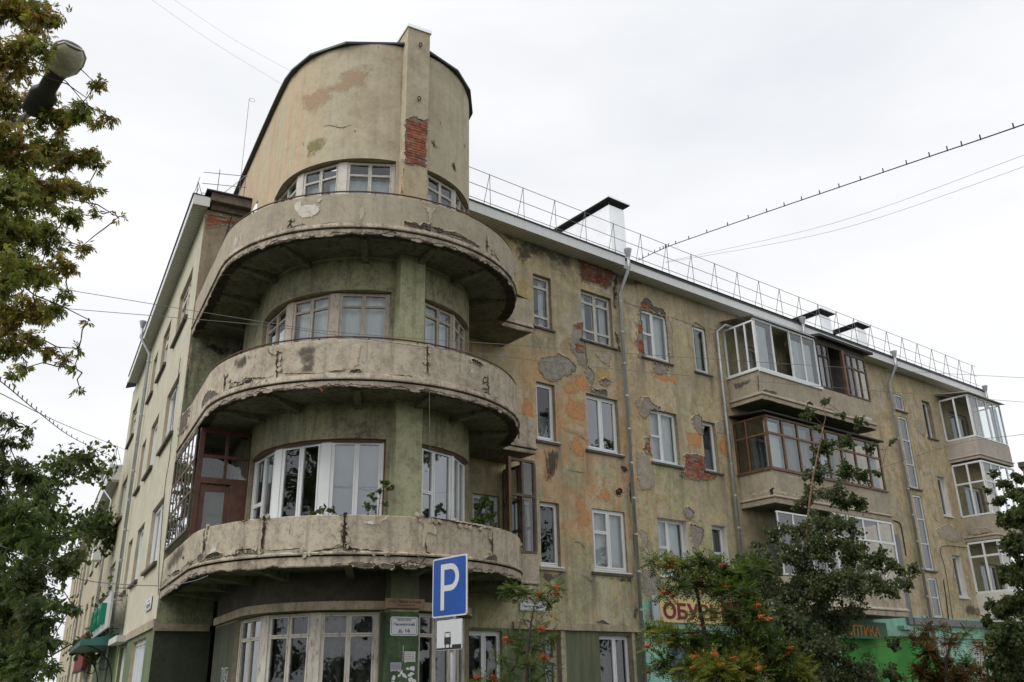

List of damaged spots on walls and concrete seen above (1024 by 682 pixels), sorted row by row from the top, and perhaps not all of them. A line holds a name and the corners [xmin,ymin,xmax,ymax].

flaking render [402,116,429,168]
spalling [187,198,527,369]
flaking render [574,257,615,290]
flaking render [635,297,678,385]
flaking render [537,321,612,421]
water stain [545,450,558,481]
flaking render [679,413,717,482]
spalling [161,550,223,599]
crack [163,512,396,584]
peeling [331,521,437,570]
spalling [468,554,521,591]
flaking render [683,505,705,548]